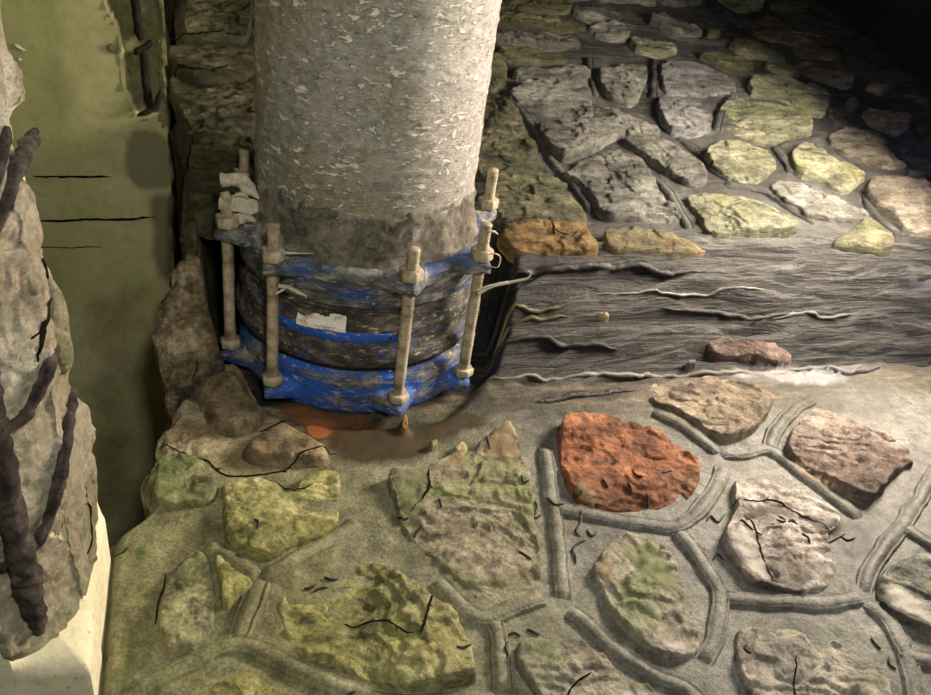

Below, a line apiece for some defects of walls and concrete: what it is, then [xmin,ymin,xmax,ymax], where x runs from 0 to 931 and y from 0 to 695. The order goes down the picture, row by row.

crack [168,30,242,40]
crack [174,63,228,77]
crack [33,172,112,180]
crack [40,215,154,223]
crack [31,246,96,362]
rust [281,406,371,438]
water stain [330,415,485,464]
water stain [485,422,518,458]
crack [159,444,337,491]
crack [732,496,831,583]
crack [344,595,433,635]